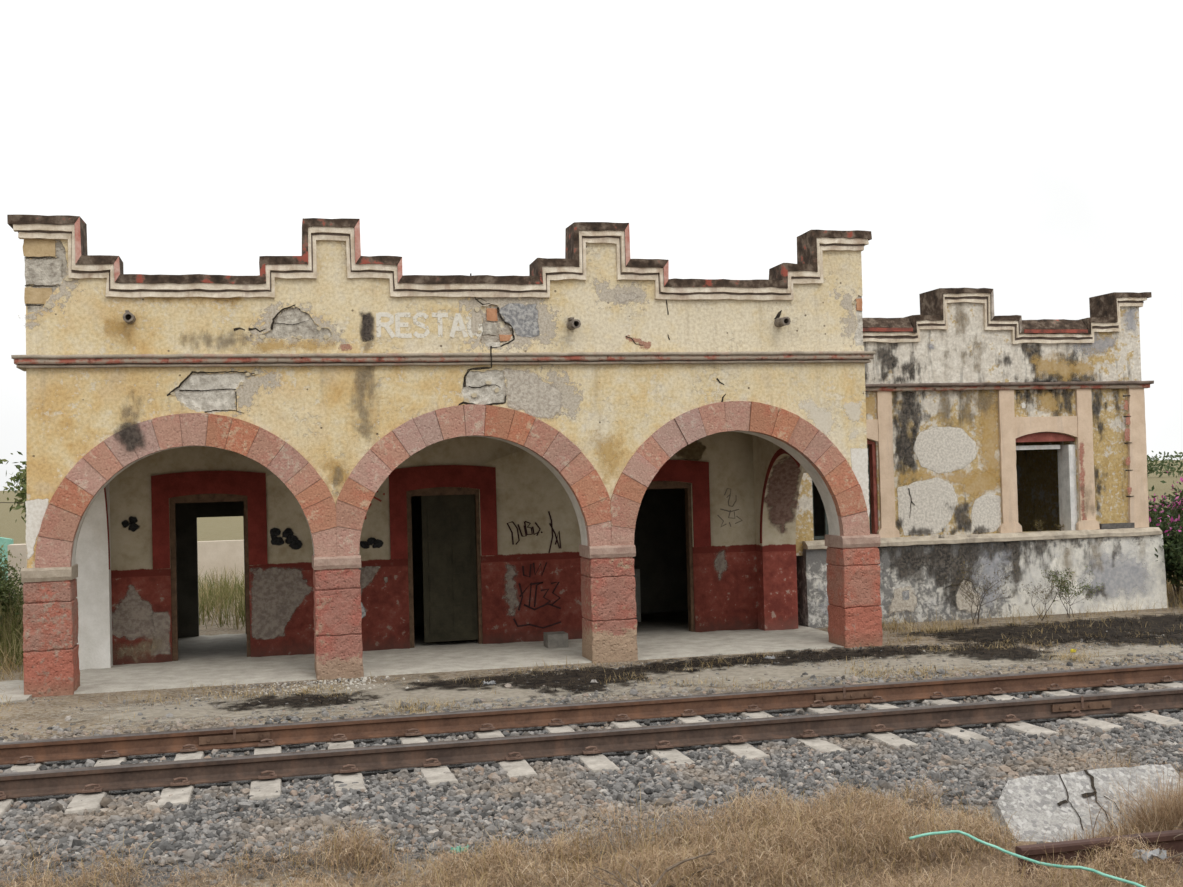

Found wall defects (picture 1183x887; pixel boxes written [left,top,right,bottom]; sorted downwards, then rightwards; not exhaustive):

spalling [23,239,73,313]
spalling [233,305,352,351]
spalling [474,305,515,348]
spalling [167,371,258,414]
flaking render [459,368,562,419]
damp [114,408,143,451]
peeling [764,456,801,533]
damp [875,343,1121,605]
peeling [112,585,171,655]
peeling [250,567,311,640]
peeling [359,566,388,618]
peeling [504,565,519,616]